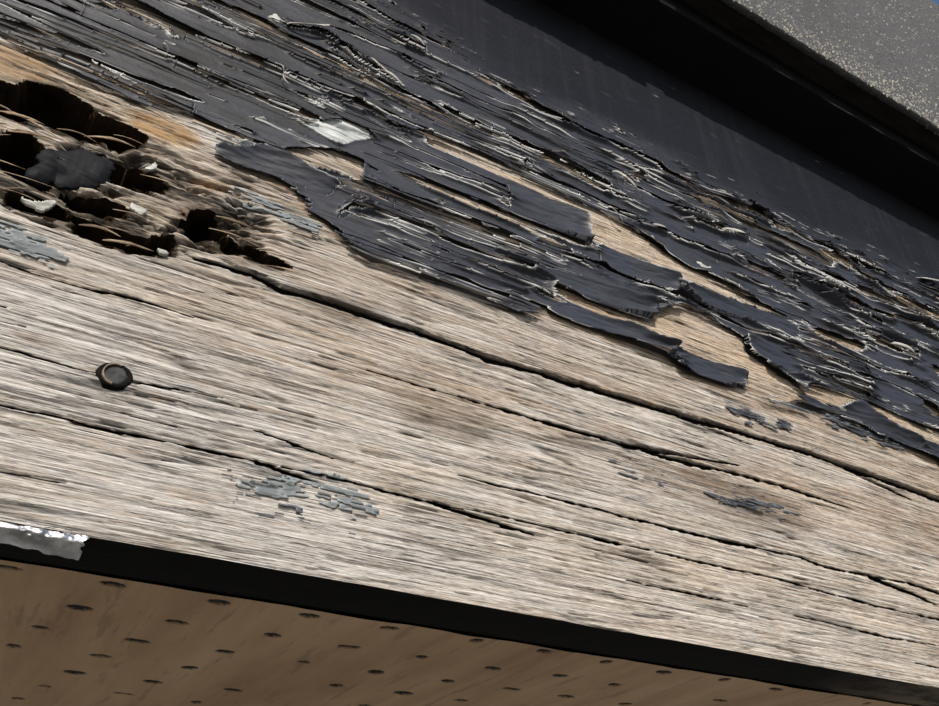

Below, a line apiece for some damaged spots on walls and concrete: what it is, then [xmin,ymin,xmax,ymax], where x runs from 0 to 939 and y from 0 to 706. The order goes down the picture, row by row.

peeling [0,3,58,34]
peeling [24,0,175,58]
peeling [57,61,166,112]
peeling [20,197,56,213]
peeling [0,220,69,263]
peeling [215,119,939,450]
crack [125,380,222,399]
crack [189,256,939,509]
peeling [236,473,379,515]
crack [0,405,939,621]
peeling [703,491,800,515]
crack [795,615,939,669]